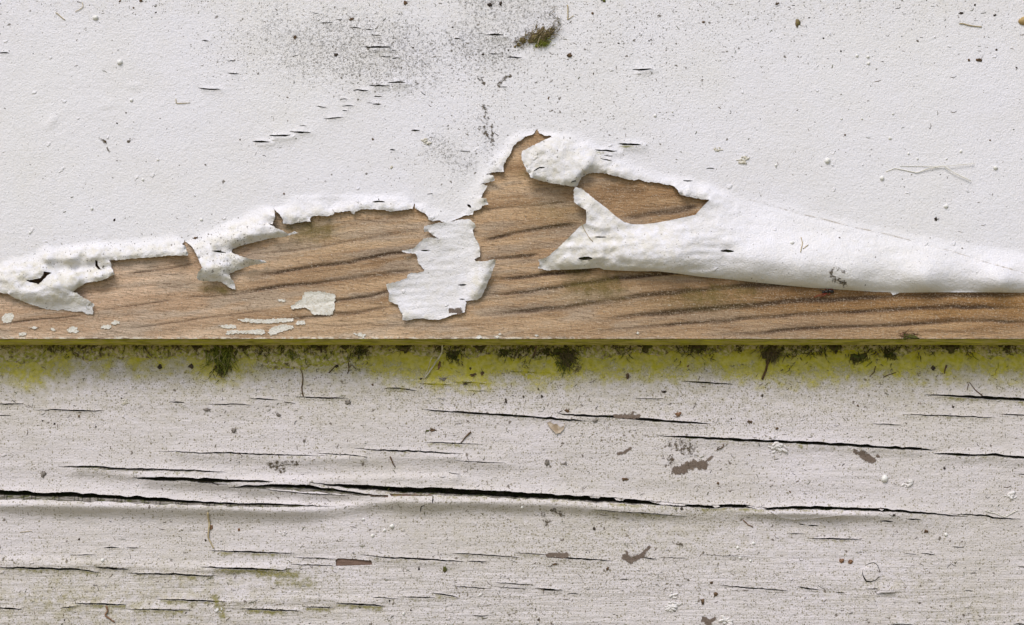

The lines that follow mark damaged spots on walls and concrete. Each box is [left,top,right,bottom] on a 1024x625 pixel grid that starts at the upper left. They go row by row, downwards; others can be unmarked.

peeling [0,129,1024,320]
peeling [219,291,336,335]
crack [385,371,1024,475]
crack [0,442,1013,540]